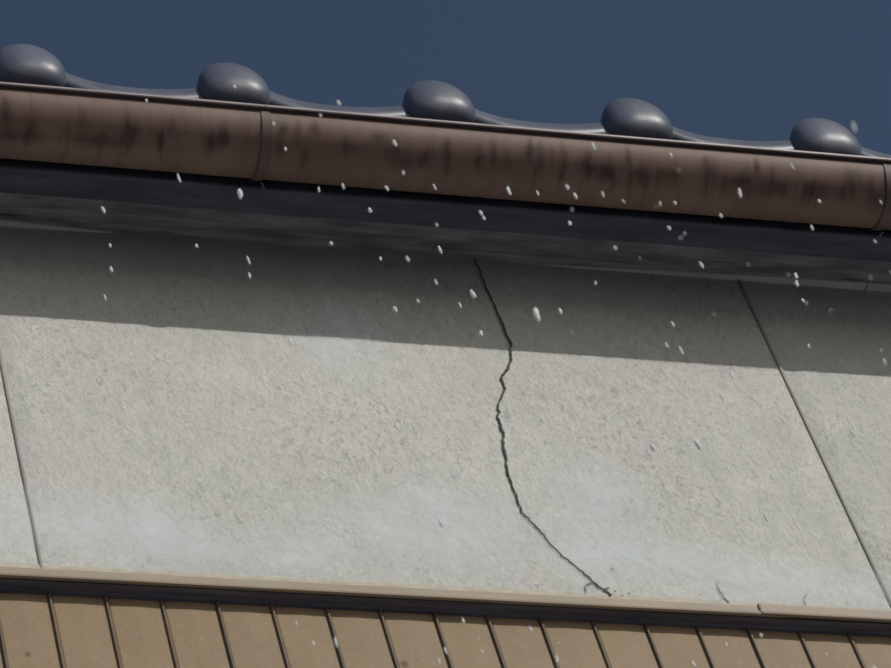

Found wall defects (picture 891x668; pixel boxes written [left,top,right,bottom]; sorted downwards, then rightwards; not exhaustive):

crack [474,258,612,597]